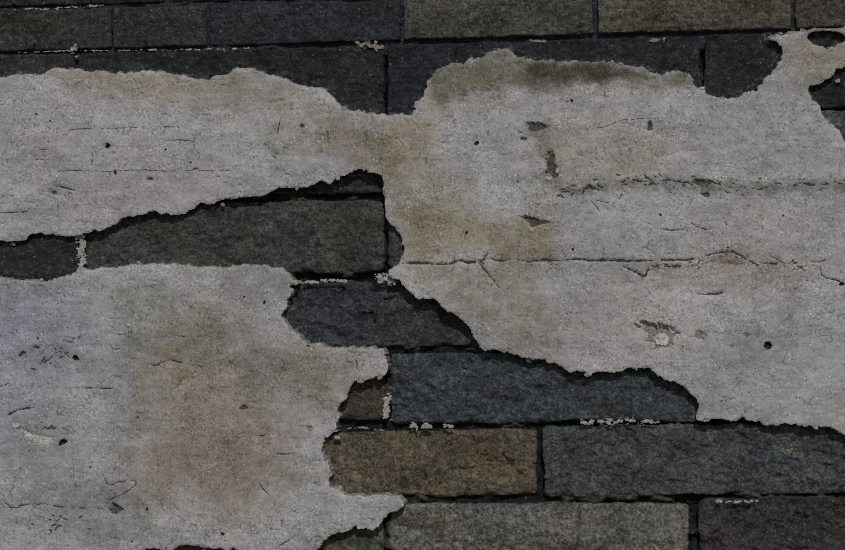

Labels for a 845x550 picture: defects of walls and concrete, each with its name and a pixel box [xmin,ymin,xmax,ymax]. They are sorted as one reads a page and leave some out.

flaking render [14,67,227,81]
flaking render [236,31,800,116]
crack [557,174,845,198]
crack [403,247,842,288]
flaking render [0,259,391,380]
spalling [642,324,675,349]
flaking render [321,380,408,505]